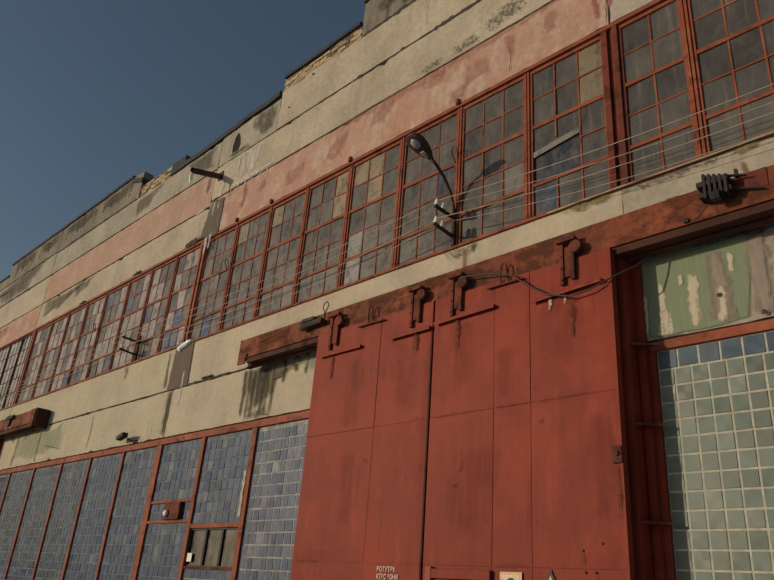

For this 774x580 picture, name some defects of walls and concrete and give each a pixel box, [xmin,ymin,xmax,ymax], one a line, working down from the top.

corrosion [665,193,701,209]
corrosion [420,274,448,290]
peeling [641,230,774,337]
corrosion [261,326,291,343]
damp [239,353,309,418]